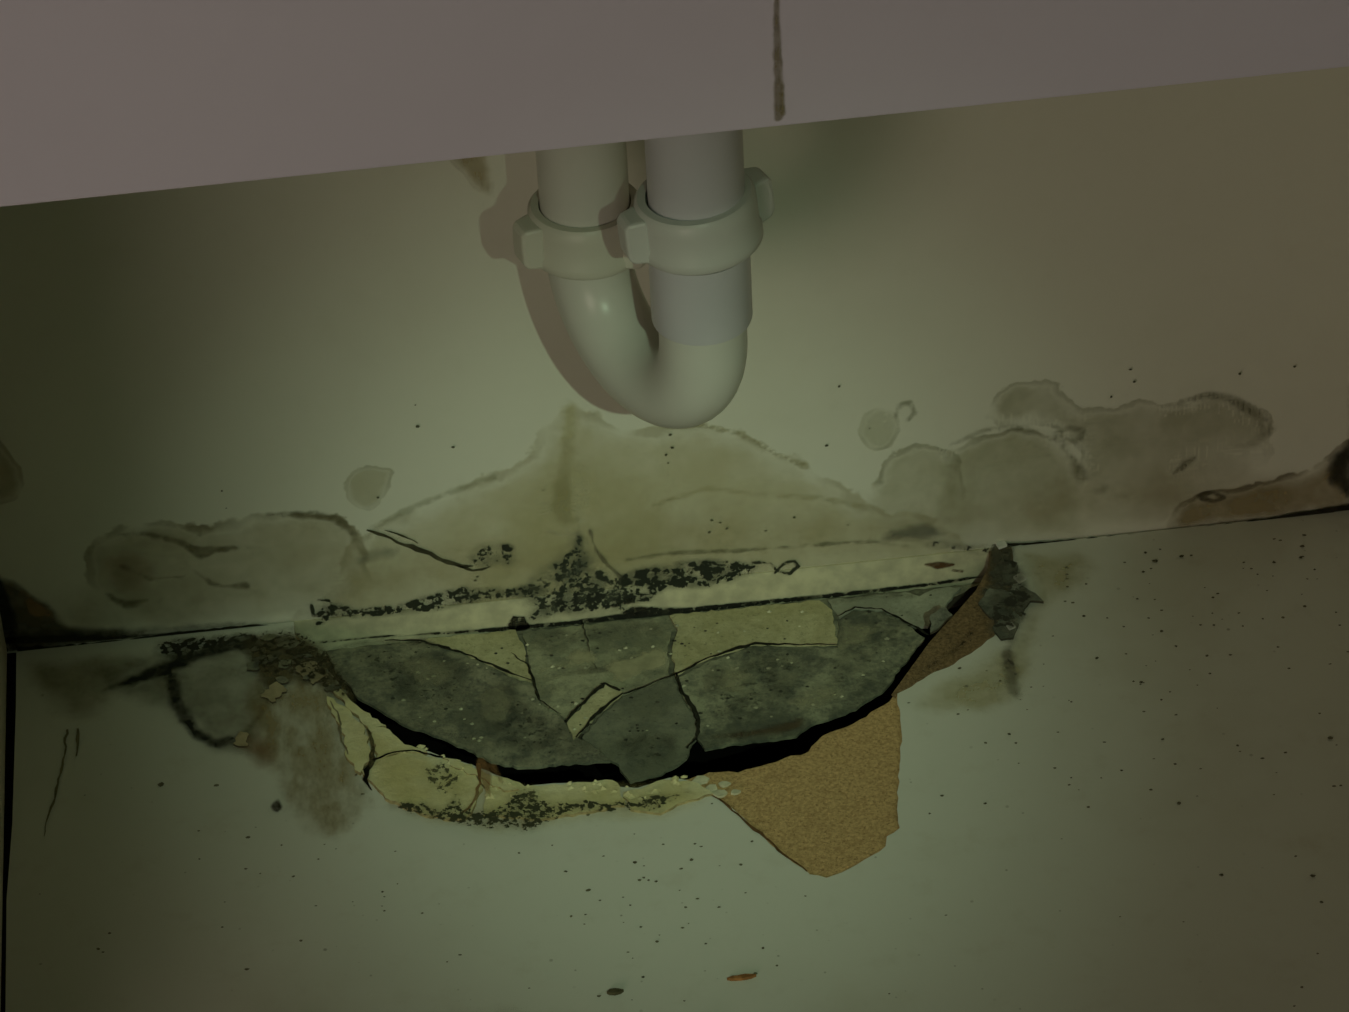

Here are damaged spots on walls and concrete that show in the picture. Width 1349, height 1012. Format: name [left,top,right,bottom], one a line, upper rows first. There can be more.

damp [292,513,357,537]
damp [1180,440,1349,526]
crack [330,701,443,790]
crack [461,763,482,813]
damp [0,525,1044,831]
crack [385,606,929,749]
spalling [327,549,1019,877]